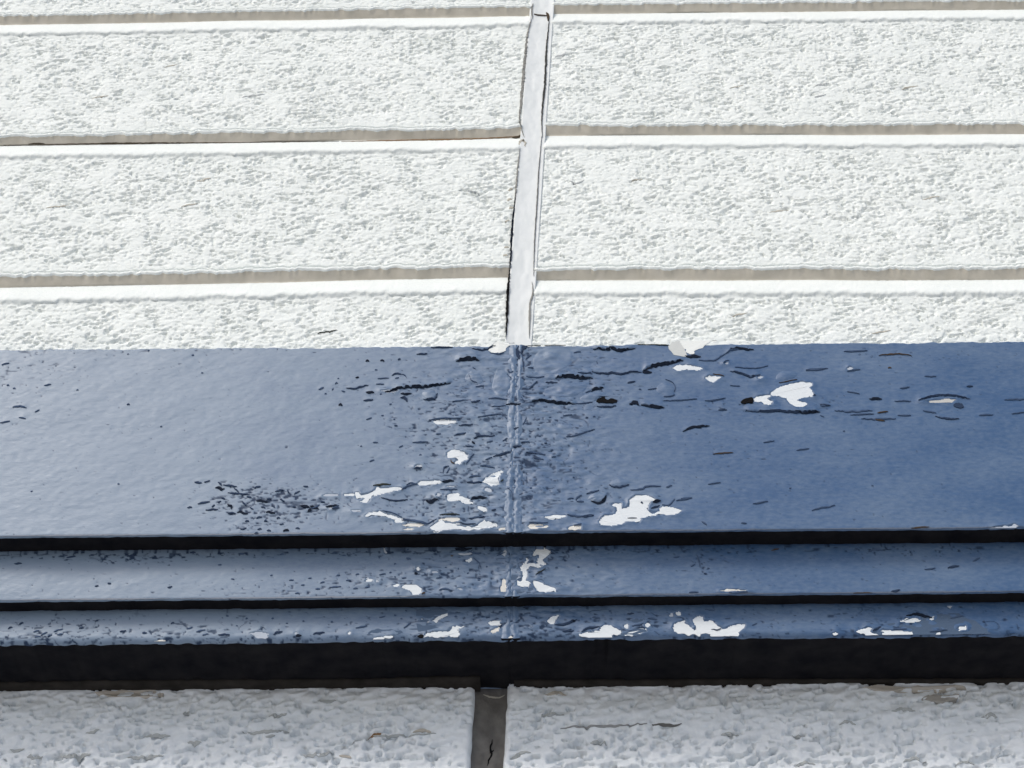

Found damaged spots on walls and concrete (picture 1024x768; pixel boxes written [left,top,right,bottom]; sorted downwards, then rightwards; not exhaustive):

crack [318,4,1024,568]
peeling [754,382,816,407]
peeling [447,450,468,465]
peeling [483,470,503,492]
peeling [187,480,505,534]
peeling [599,495,681,526]
peeling [500,548,565,593]
peeling [394,614,464,638]
peeling [669,611,745,637]
peeling [856,616,934,635]